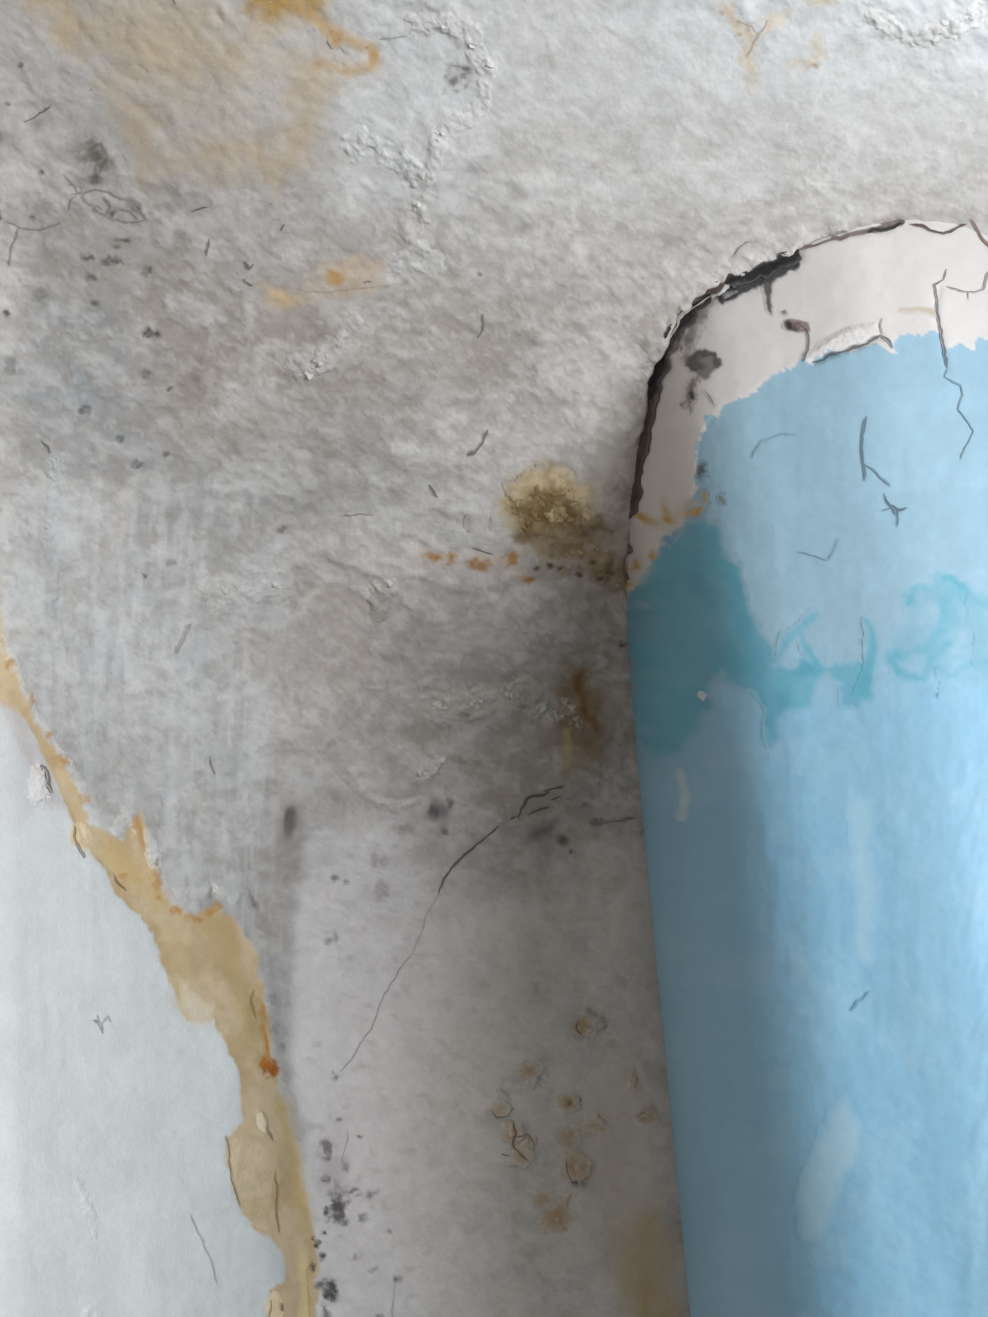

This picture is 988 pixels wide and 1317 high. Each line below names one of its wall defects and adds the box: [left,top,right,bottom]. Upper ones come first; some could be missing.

damp [0,0,401,283]
damp [139,325,164,340]
damp [243,249,399,318]
flaking render [679,251,812,415]
crack [622,219,988,584]
corrosion [404,540,548,591]
peeling [626,514,988,764]
flaking render [0,627,322,1317]
damp [267,791,311,857]
mould [328,795,456,906]
crack [340,785,565,1072]
mould [308,1111,380,1317]